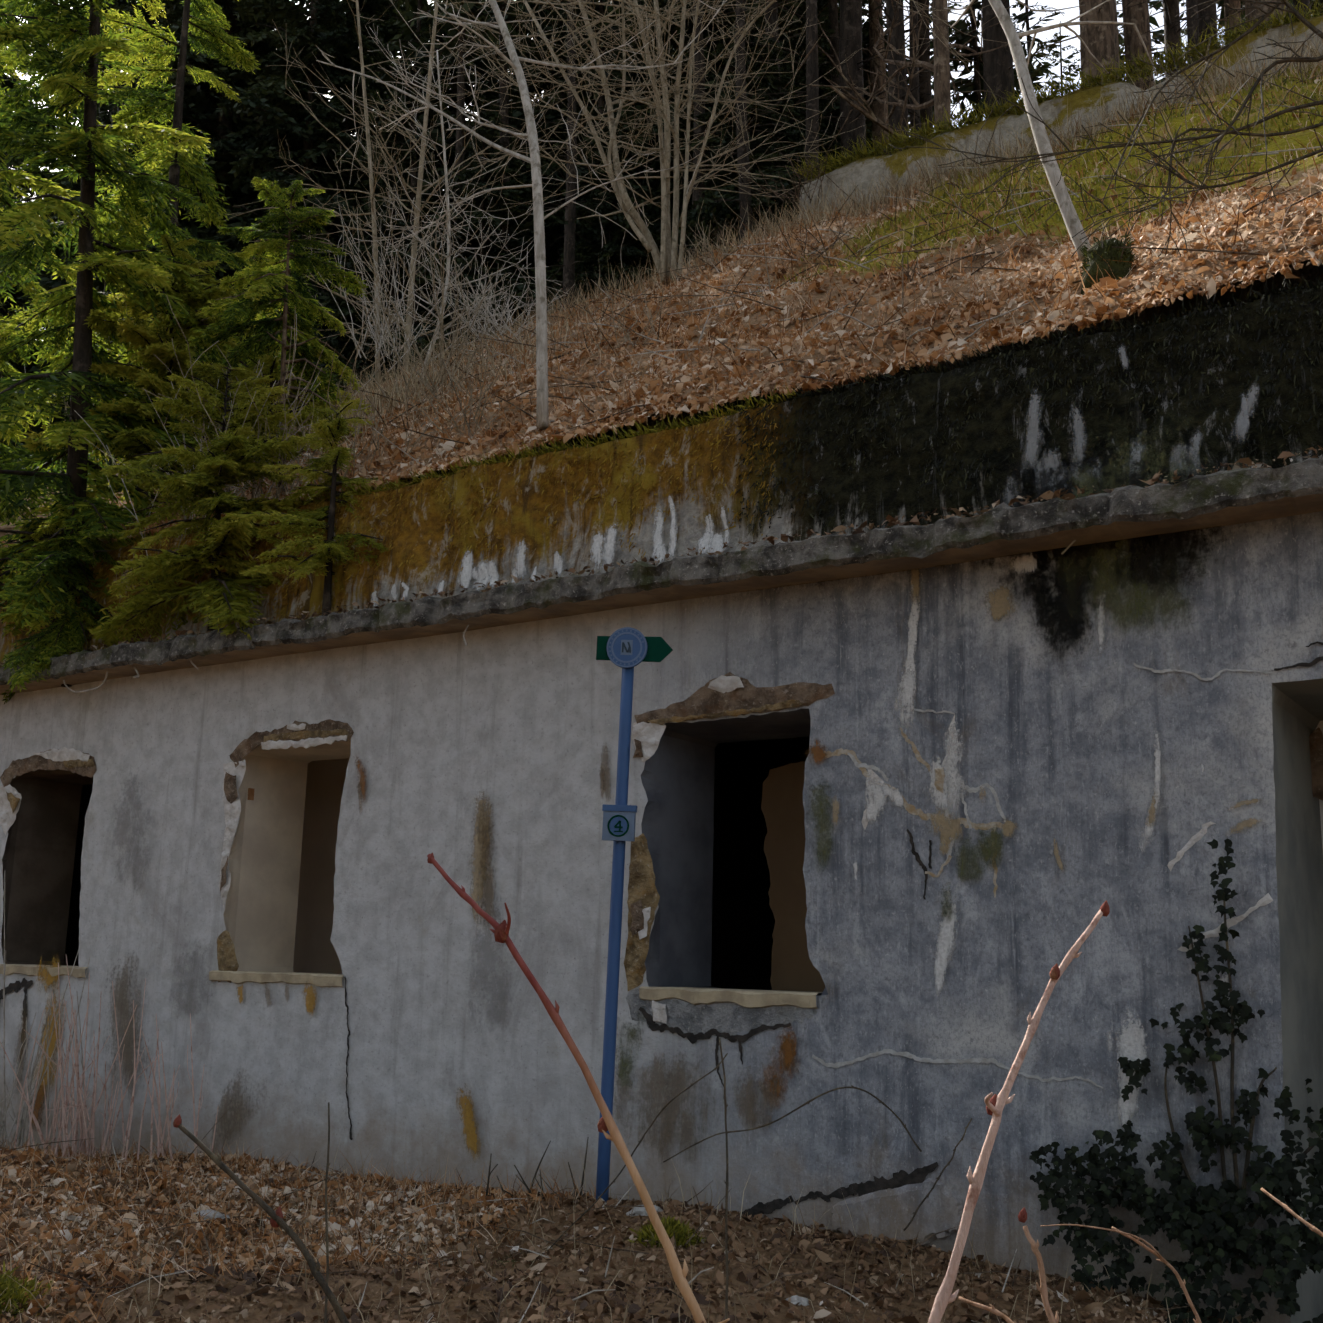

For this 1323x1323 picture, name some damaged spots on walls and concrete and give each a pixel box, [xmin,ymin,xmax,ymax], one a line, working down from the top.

damp [981,395,1232,514]
damp [437,541,537,592]
damp [652,496,677,563]
damp [982,529,1218,659]
crack [1134,641,1323,681]
spalling [1309,727,1323,801]
spalling [624,833,817,1037]
crack [0,978,33,1030]
corrosion [265,984,317,1014]
corrosion [14,957,65,1127]
crack [639,1007,791,1087]
crack [742,1162,939,1217]